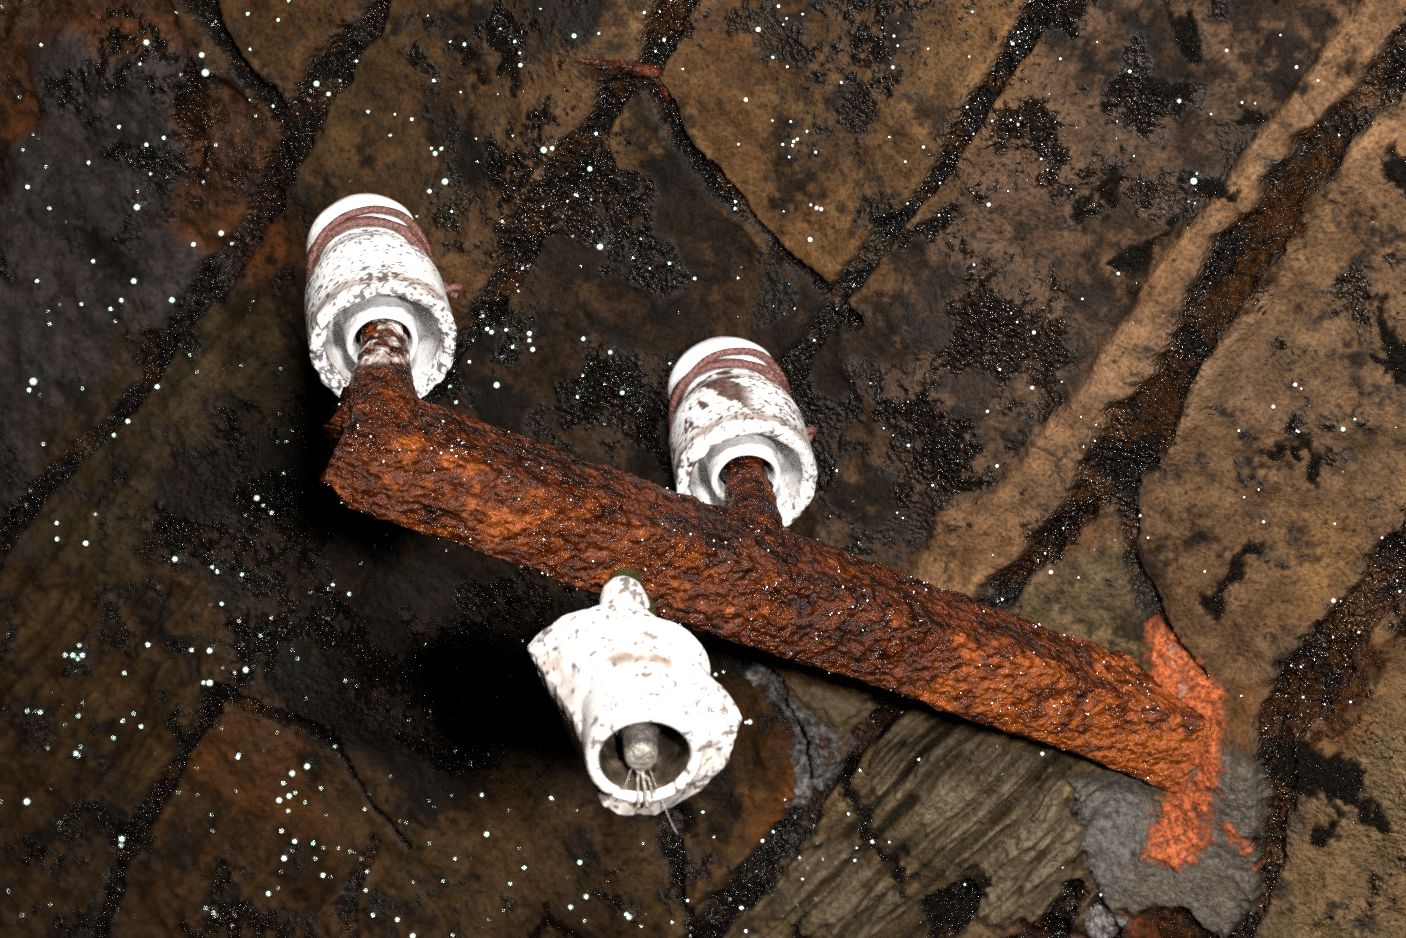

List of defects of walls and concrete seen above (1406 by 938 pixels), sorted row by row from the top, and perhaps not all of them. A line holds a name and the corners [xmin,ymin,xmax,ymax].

damp [1143,0,1202,113]
damp [1176,173,1240,202]
damp [1382,144,1406,198]
damp [1106,209,1187,274]
damp [1369,293,1406,386]
damp [1259,434,1322,487]
corrosion [214,726,275,784]
corrosion [1142,621,1252,870]
crack [650,800,699,837]
crack [839,759,909,901]
crack [527,902,583,938]
damp [1071,905,1129,938]